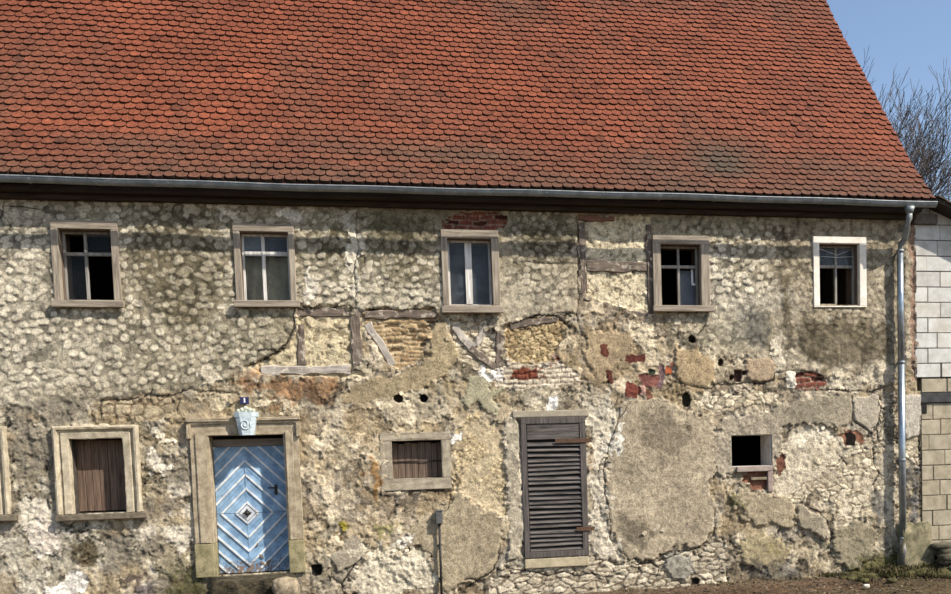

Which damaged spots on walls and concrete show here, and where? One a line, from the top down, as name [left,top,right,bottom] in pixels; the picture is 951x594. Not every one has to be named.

crack [247,213,378,367]
flaking render [249,207,580,410]
crack [99,387,231,420]
peeling [253,391,305,415]
flaking render [488,214,727,594]
flaking render [682,322,921,541]
water stain [69,520,113,566]
crack [796,497,833,550]
water stain [121,572,154,594]